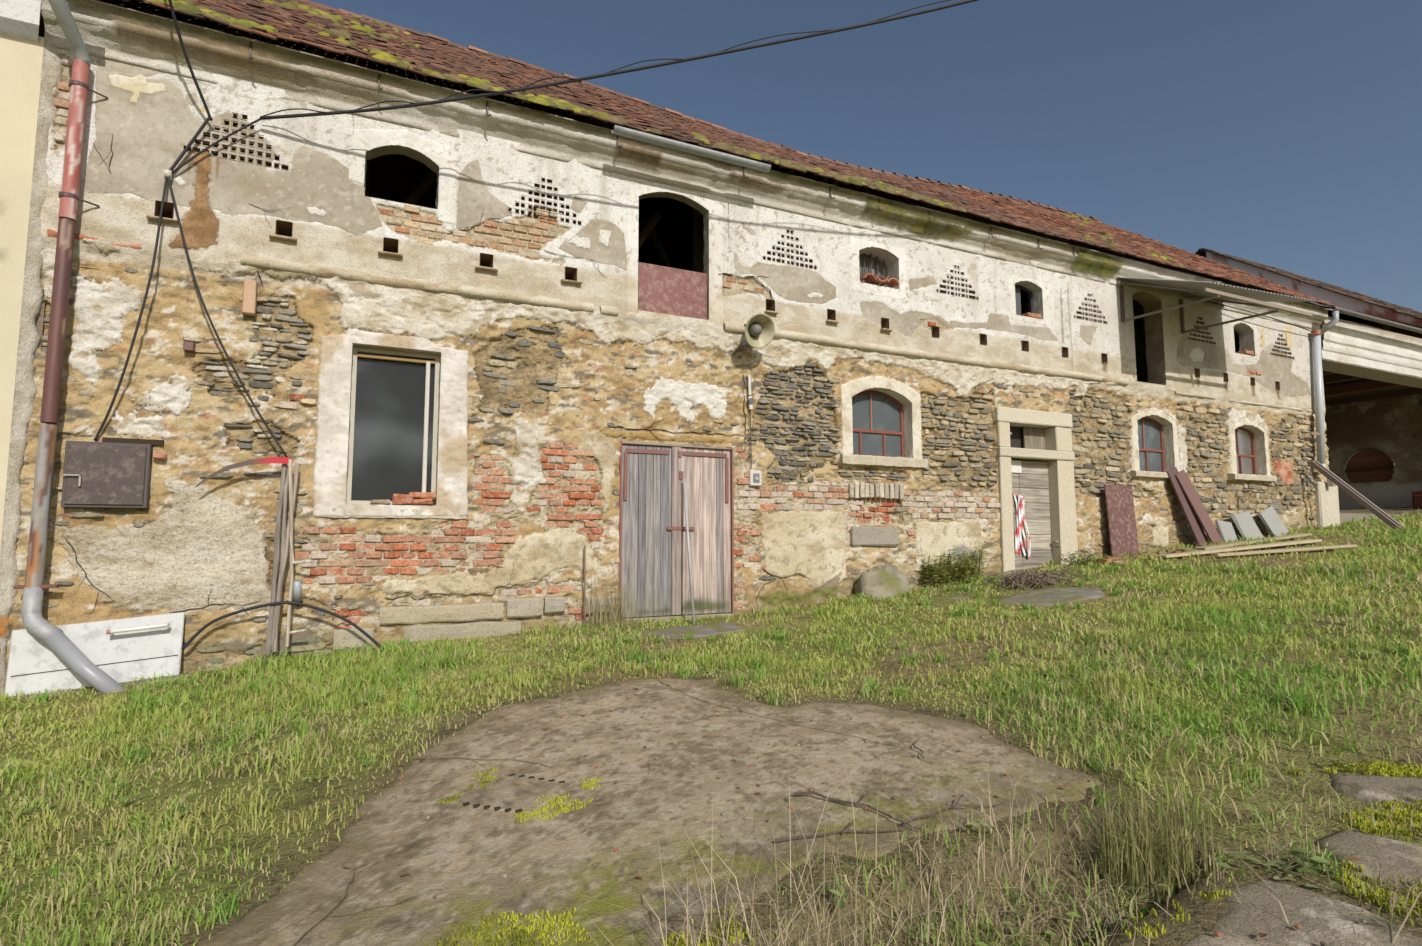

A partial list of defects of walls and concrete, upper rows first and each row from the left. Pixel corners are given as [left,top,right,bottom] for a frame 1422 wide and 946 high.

peeling [74,58,627,281]
flaking render [41,229,57,298]
flaking render [68,276,154,389]
flaking render [181,256,734,353]
peeling [722,254,836,321]
peeling [908,276,937,291]
flaking render [861,301,1108,363]
flaking render [752,338,1118,397]
flaking render [110,374,195,440]
flaking render [280,392,307,423]
flaking render [294,418,617,630]
crack [64,537,111,610]